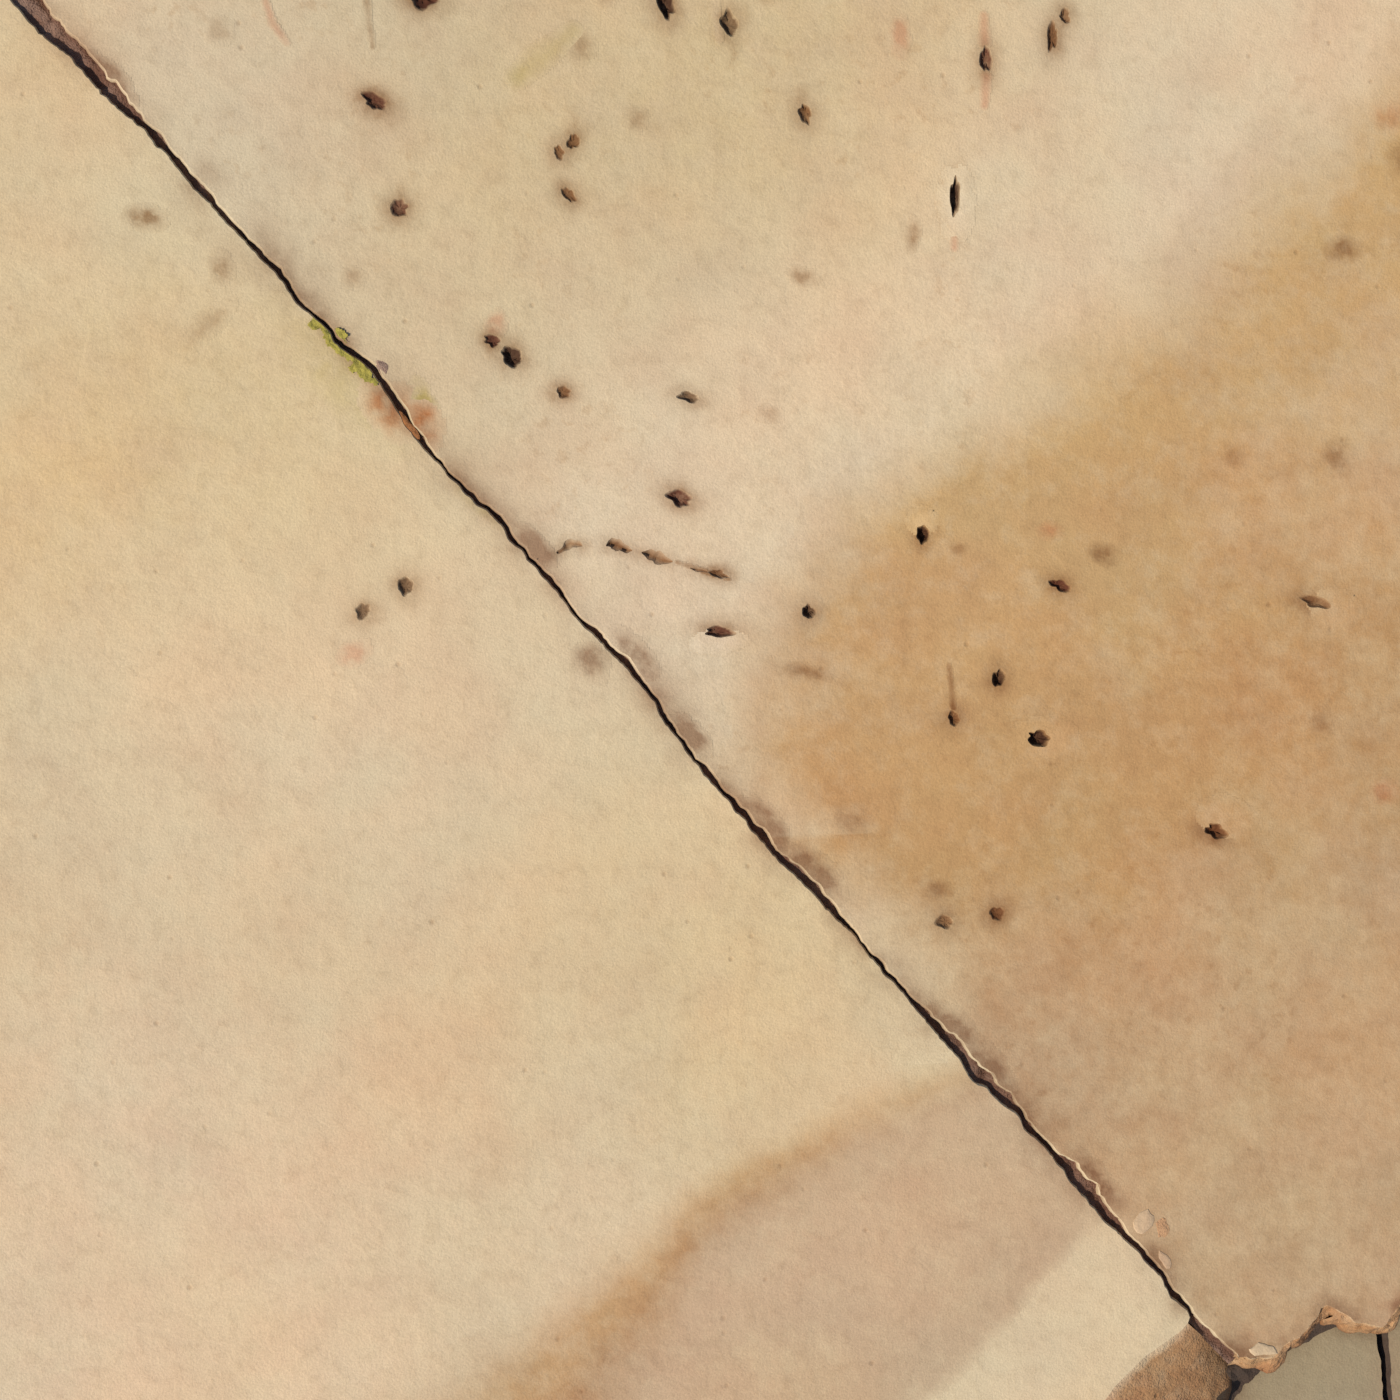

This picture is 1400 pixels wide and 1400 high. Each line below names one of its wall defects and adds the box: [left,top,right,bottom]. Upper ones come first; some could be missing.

leakage [1367,94,1400,181]
crack [12,0,411,423]
leakage [784,264,822,291]
leakage [903,215,923,255]
leakage [1319,233,1368,266]
leakage [1316,435,1358,481]
leakage [1083,540,1124,569]
leakage [772,660,837,685]
crack [418,432,1235,1364]
leakage [315,1052,1103,1400]
spalling [1133,1209,1172,1269]
spalling [1105,1305,1400,1400]